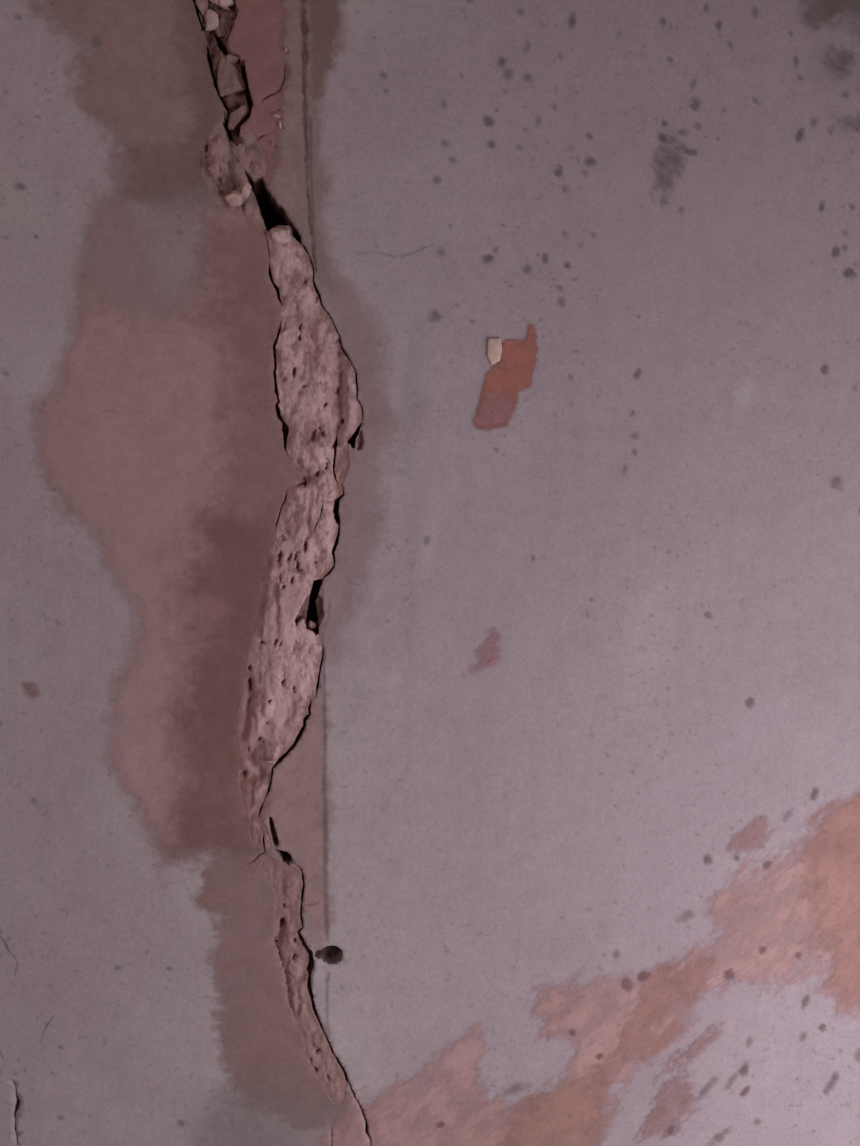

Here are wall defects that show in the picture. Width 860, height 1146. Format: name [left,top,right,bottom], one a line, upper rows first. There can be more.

water stain [39,0,348,1128]
crack [193,0,322,306]
crack [274,334,289,449]
crack [260,428,364,1018]
water stain [265,0,388,652]